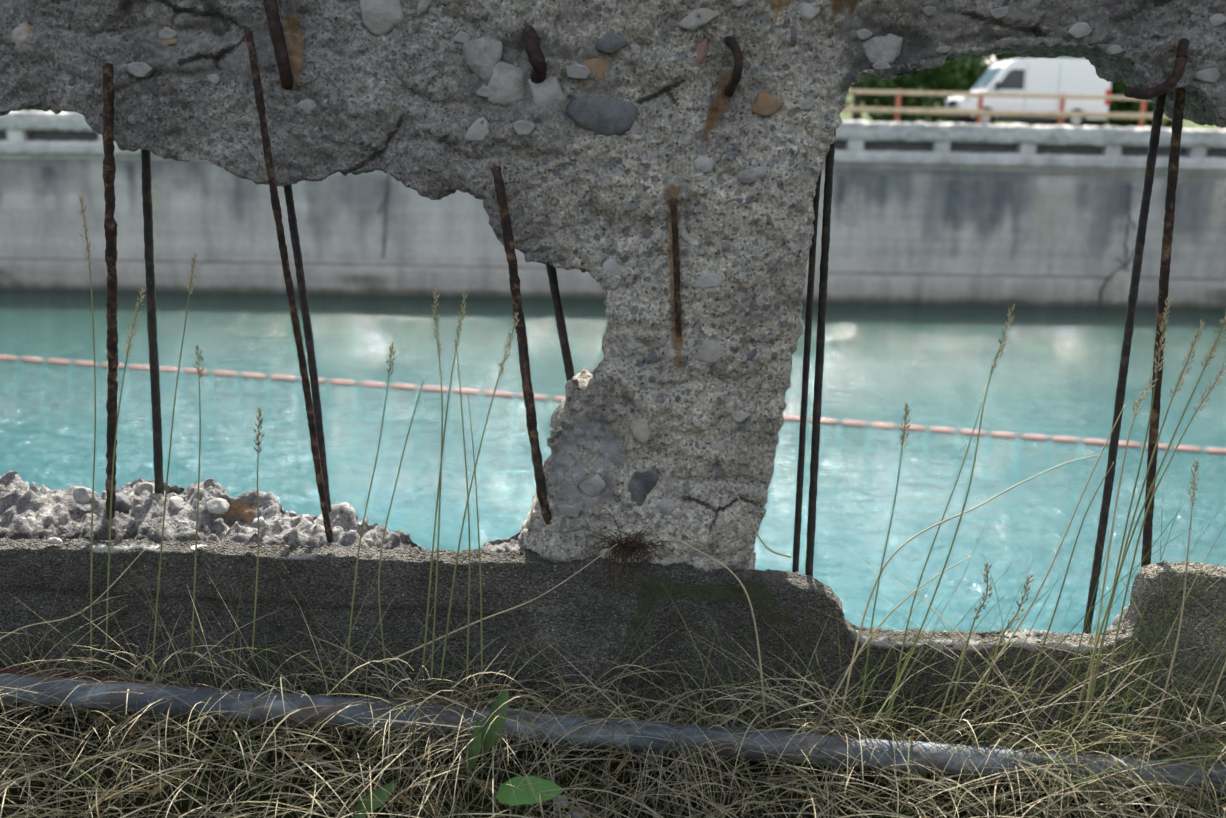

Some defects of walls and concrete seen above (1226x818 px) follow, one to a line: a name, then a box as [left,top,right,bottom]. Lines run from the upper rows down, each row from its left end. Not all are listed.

rust [284,15,303,87]
rust [830,0,857,22]
spalling [846,1,965,74]
spalling [985,6,1123,55]
rust [702,72,739,139]
spalling [102,0,334,543]
spalling [491,166,551,525]
spalling [546,263,575,381]
spalling [792,129,836,577]
spalling [854,38,1226,653]
rust [216,502,255,523]
crack [681,496,762,532]